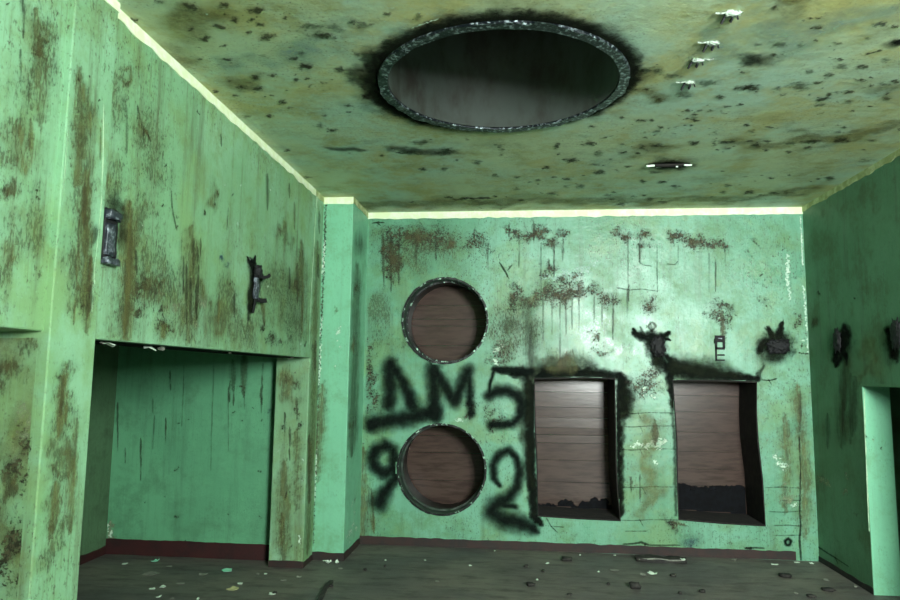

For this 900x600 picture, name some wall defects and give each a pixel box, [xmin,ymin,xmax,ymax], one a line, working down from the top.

water stain [748,55,768,64]
corrosion [0,179,22,198]
corrosion [74,170,97,333]
corrosion [117,200,164,341]
corrosion [153,194,205,343]
water stain [486,298,543,383]
corrosion [56,375,67,437]
corrosion [279,368,302,460]